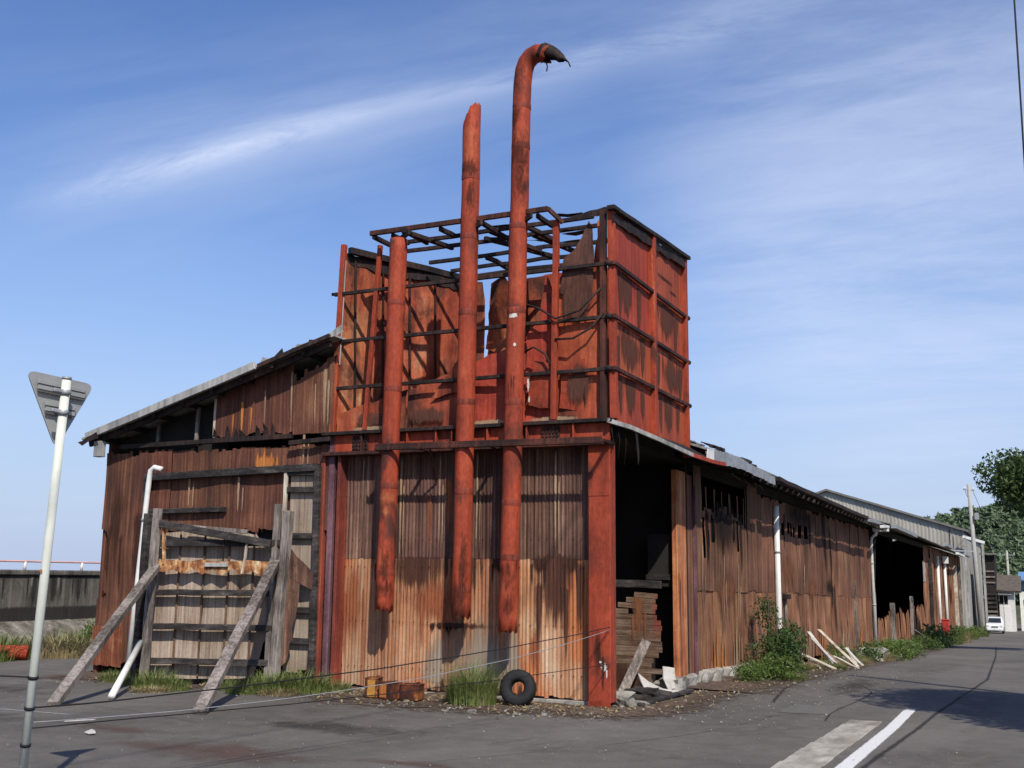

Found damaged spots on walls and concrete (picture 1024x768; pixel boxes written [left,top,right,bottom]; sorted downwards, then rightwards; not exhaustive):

rust [158,559,269,577]
rust [343,572,364,652]
rust [395,556,484,638]
rust [530,554,584,681]